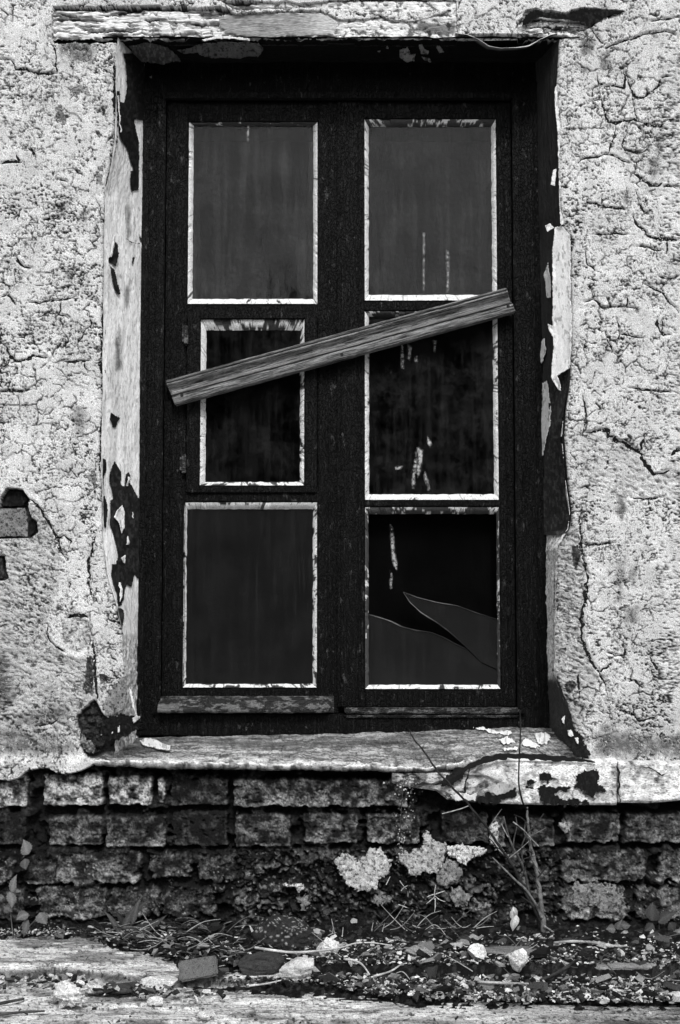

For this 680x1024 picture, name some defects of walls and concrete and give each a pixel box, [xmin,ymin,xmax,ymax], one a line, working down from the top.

spalling [455,8,630,57]
peeling [117,36,263,192]
crack [578,69,679,350]
crack [1,294,106,394]
peeling [540,86,584,693]
crack [582,395,680,500]
crack [30,499,99,701]
spalling [62,617,143,754]
peeling [85,459,140,628]
peeling [441,711,606,808]
crack [418,753,666,804]
crack [565,505,658,722]